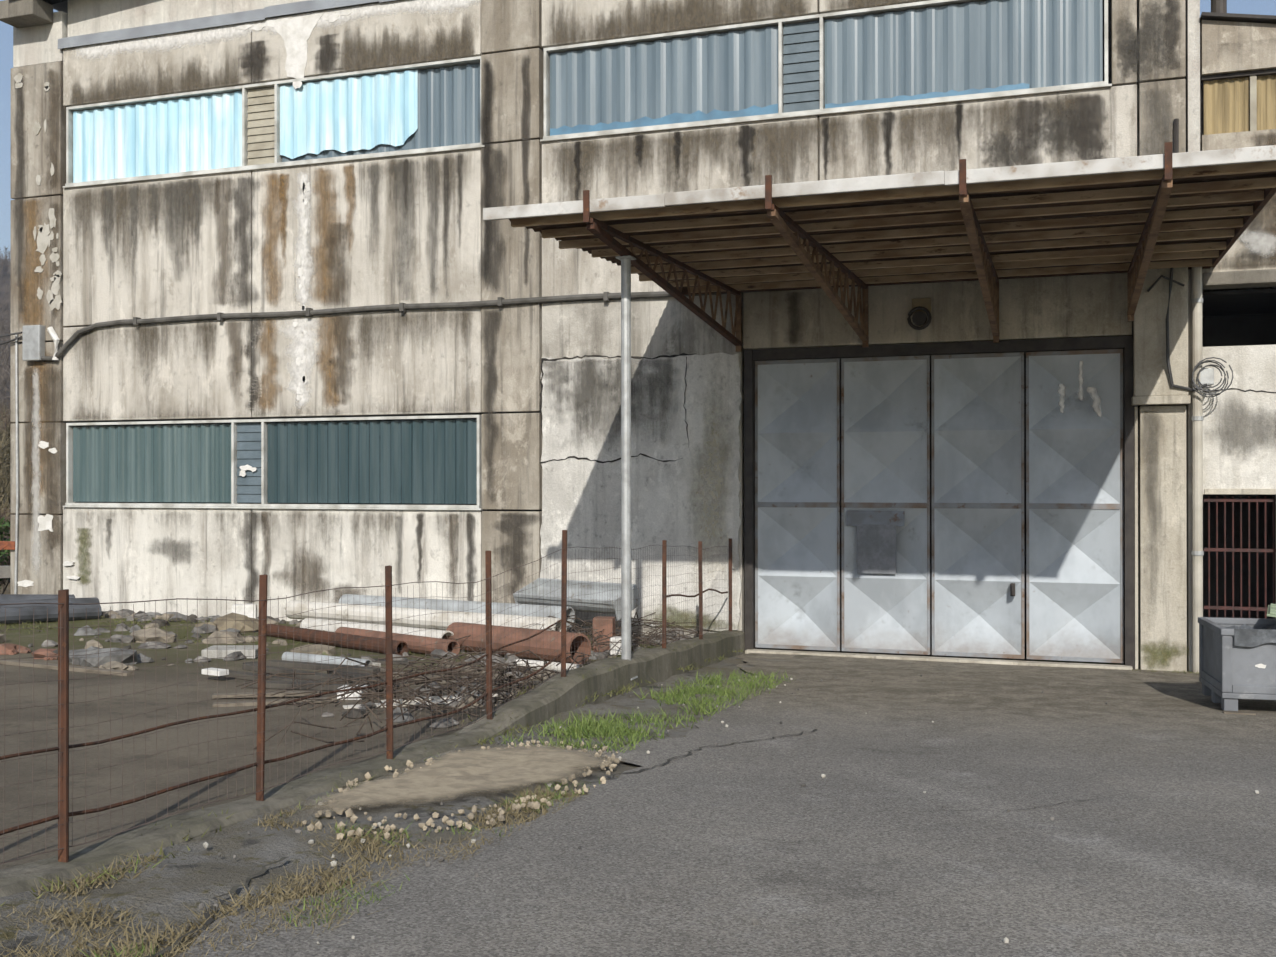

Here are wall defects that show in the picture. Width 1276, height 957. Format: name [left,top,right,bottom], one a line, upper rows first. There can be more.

water stain [552,0,806,44]
water stain [831,0,924,9]
water stain [15,88,24,308]
flaking render [33,208,62,311]
water stain [49,41,265,187]
water stain [74,178,254,305]
efflorescence [283,173,316,406]
water stain [557,118,847,200]
water stain [861,95,1104,169]
water stain [196,320,265,415]
crack [540,353,696,464]
crack [1215,386,1276,394]